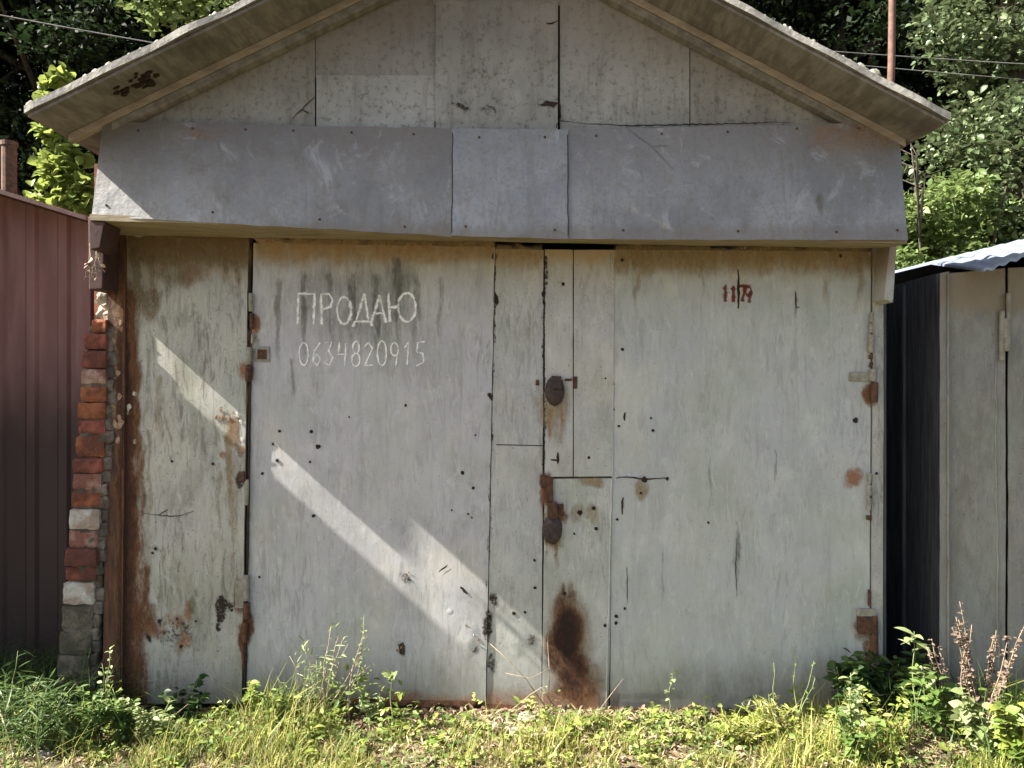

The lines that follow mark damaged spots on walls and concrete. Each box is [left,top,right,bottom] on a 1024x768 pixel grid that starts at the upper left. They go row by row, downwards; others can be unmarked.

rust [862,384,874,405]
rust [114,275,194,711]
rust [847,469,862,485]
rust [488,589,620,710]